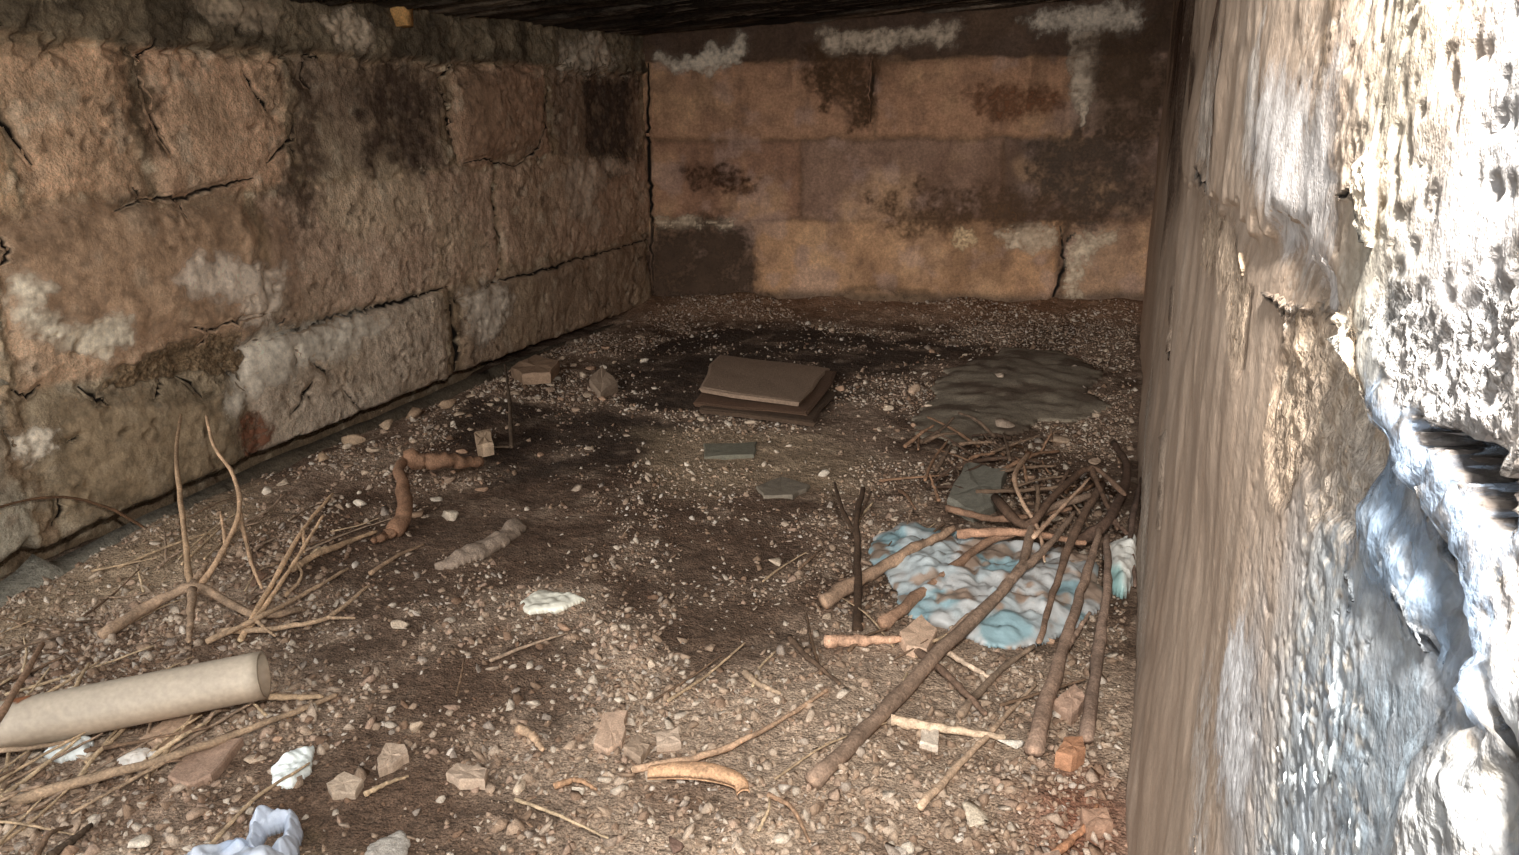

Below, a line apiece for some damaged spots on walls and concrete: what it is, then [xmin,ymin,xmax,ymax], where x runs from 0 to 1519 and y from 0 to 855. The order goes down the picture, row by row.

crack [0,108,35,167]
crack [1,383,110,456]
crack [112,37,318,220]
damp [192,0,277,35]
damp [277,74,324,229]
damp [317,0,443,177]
crack [152,63,658,415]
damp [518,0,1222,298]
damp [1242,10,1346,311]
crack [1261,291,1343,356]
crack [1335,184,1373,248]
spalling [1263,255,1519,546]